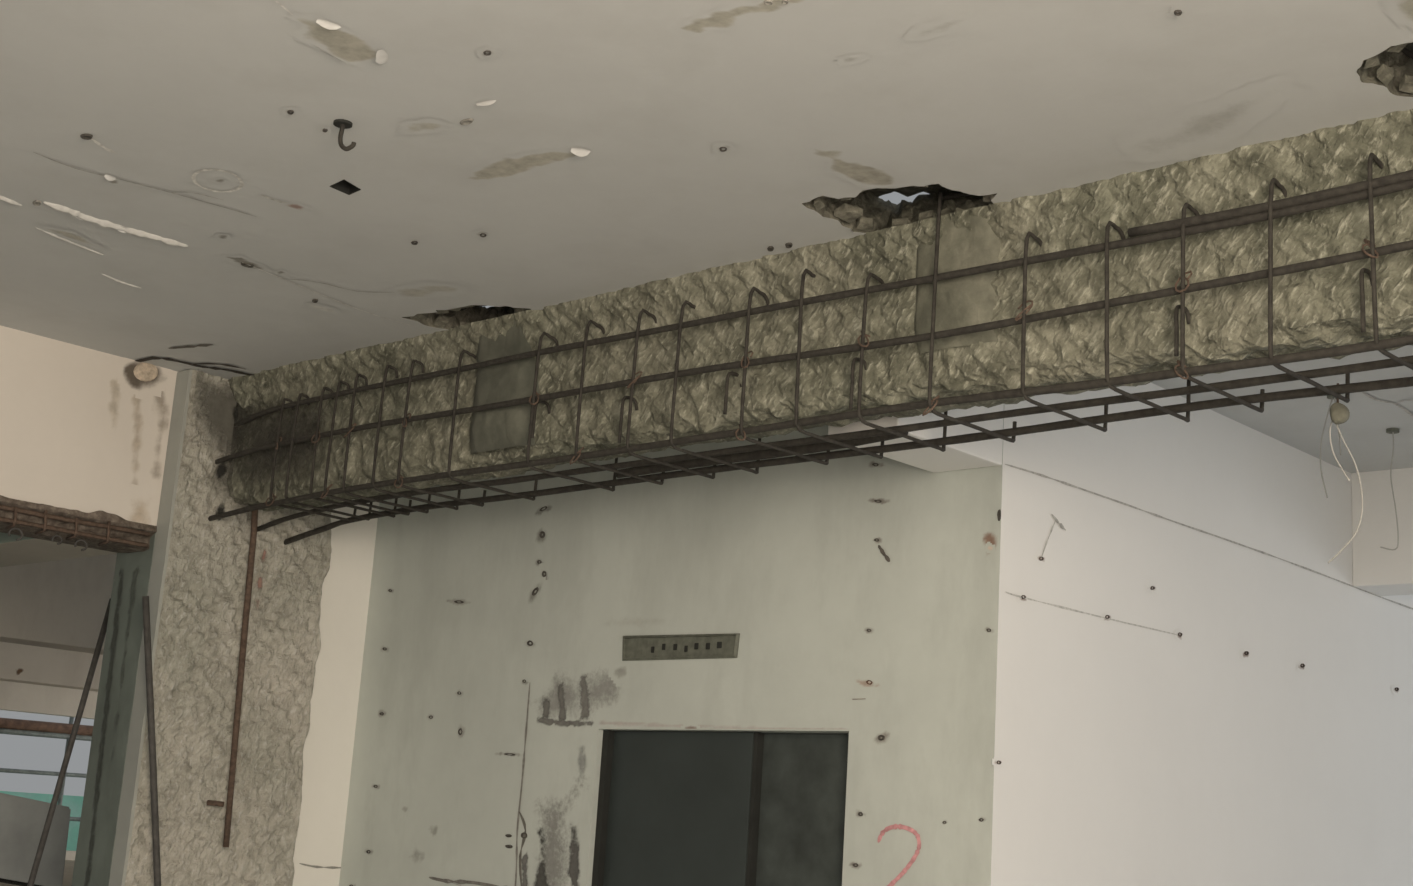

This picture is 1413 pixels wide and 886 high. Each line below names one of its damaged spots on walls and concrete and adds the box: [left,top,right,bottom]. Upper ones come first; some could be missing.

peeling [285,12,388,66]
spalling [1357,42,1413,97]
peeling [458,147,592,182]
spalling [802,144,997,233]
spalling [212,233,288,276]
spalling [402,305,531,330]
leakage [101,368,175,526]
spalling [0,495,157,553]
leakage [597,607,679,637]
spalling [206,510,258,847]
leakage [512,651,633,886]